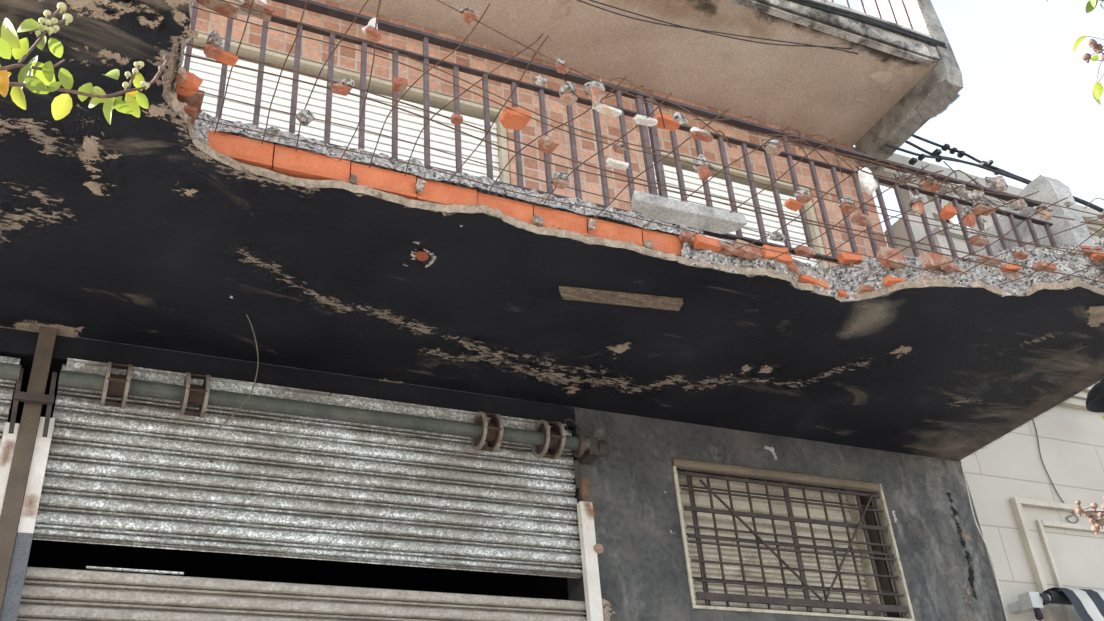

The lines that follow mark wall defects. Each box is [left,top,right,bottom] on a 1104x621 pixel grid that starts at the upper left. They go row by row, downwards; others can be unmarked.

peeling [0,103,123,196]
spalling [62,0,1104,327]
peeling [0,181,76,243]
peeling [606,342,632,359]
peeling [741,365,775,374]
peeling [890,345,914,358]
peeling [967,360,1104,452]
crack [907,460,978,621]